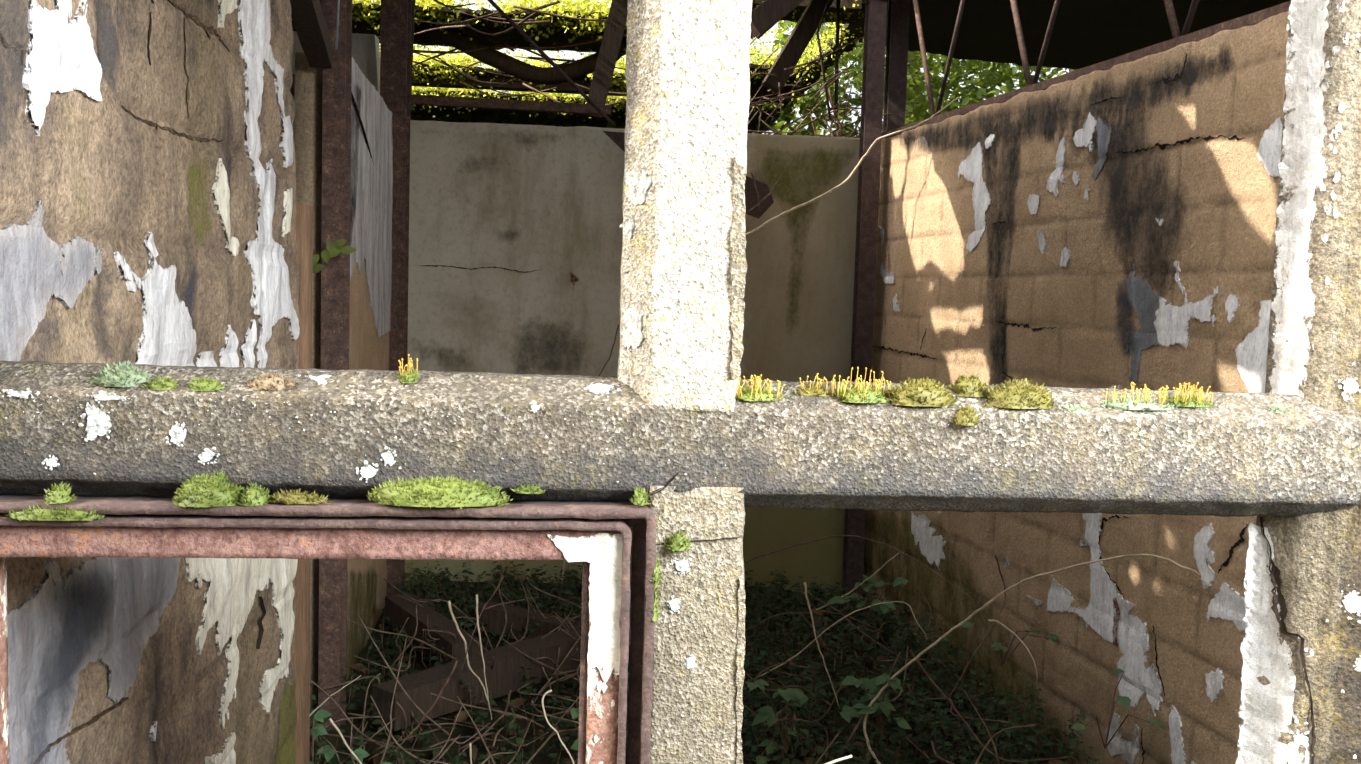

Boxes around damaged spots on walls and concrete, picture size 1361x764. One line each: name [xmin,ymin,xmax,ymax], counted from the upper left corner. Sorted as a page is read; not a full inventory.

flaking render [0,0,300,368]
crack [122,0,230,142]
leakage [762,151,842,235]
flaking render [958,134,995,252]
flaking render [1060,244,1071,267]
leakage [904,49,1230,386]
flaking render [1027,112,1111,215]
flaking render [7,557,298,764]
flaking render [911,511,947,571]
flaking render [1027,513,1195,764]
peeling [1193,521,1314,764]
crack [1218,517,1316,764]